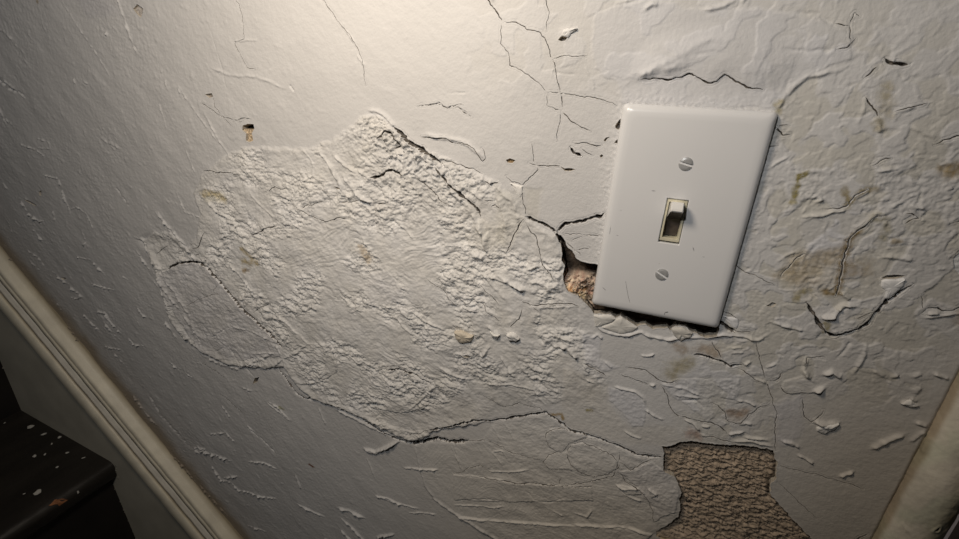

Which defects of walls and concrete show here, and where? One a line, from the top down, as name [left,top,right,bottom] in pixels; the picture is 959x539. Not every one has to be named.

crack [833,10,862,52]
crack [639,70,766,92]
crack [861,56,928,118]
flaking render [241,122,255,143]
crack [768,122,792,150]
crack [933,132,959,147]
crack [268,0,618,329]
crack [252,224,277,236]
crack [582,155,959,451]
crack [155,232,662,523]
flaking render [655,439,813,539]